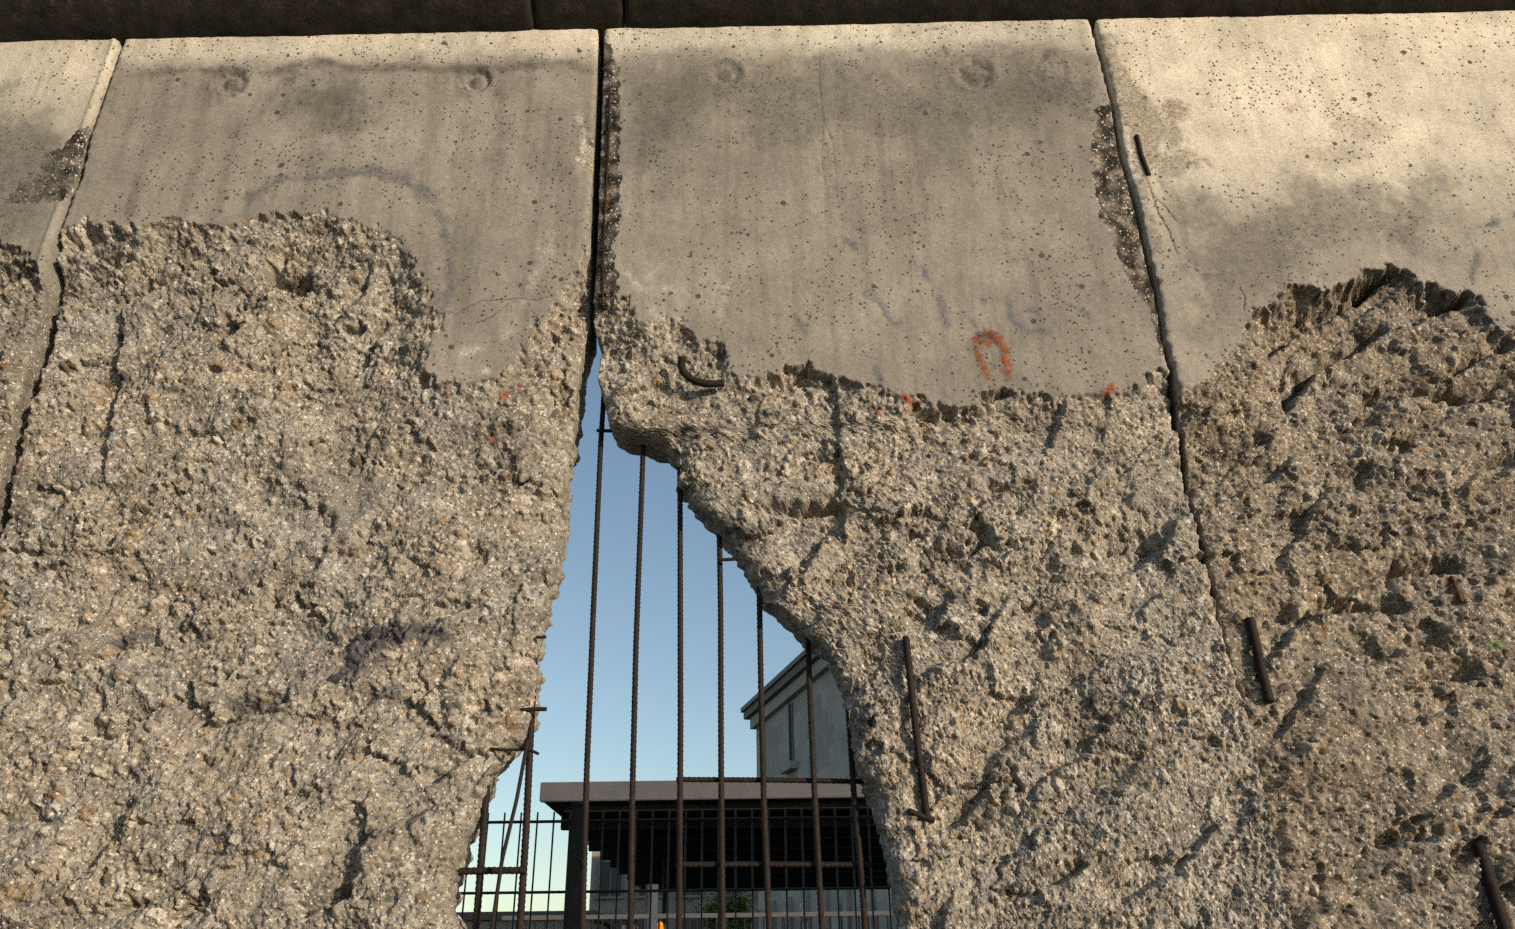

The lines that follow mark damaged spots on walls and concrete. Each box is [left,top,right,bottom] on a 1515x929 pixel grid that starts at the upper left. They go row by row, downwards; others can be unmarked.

spalling [0,42,622,929]
spalling [593,263,1515,929]
spalling [1090,35,1196,355]